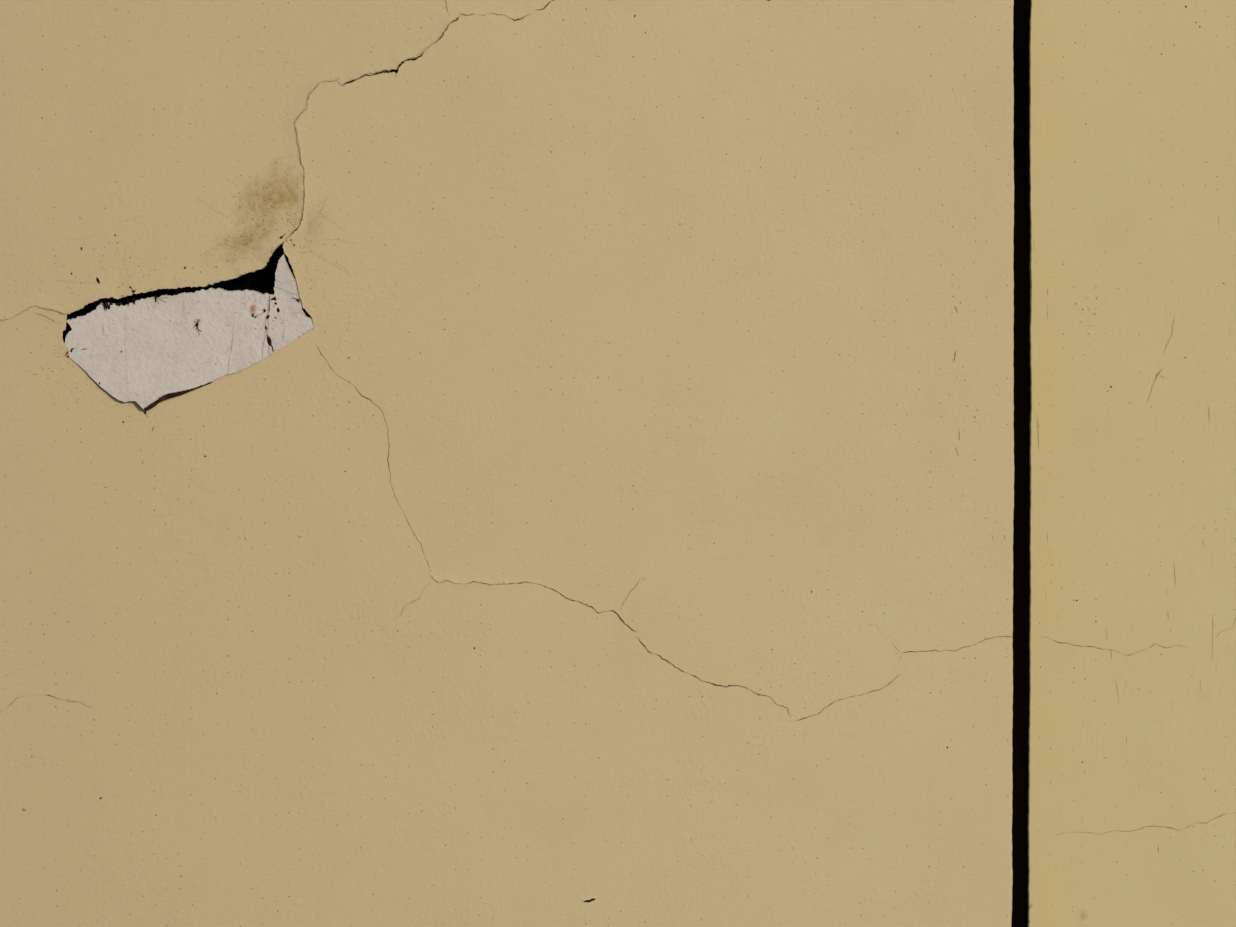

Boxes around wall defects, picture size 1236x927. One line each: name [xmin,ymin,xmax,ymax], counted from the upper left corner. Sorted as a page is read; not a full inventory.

crack [266,0,554,252]
crack [0,267,67,341]
peeling [50,206,326,411]
crack [317,346,1236,720]